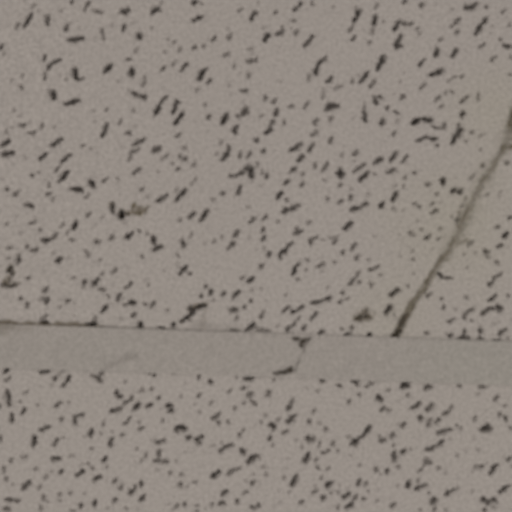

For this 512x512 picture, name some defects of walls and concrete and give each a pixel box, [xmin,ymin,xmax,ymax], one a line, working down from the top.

crack [391,274,431,338]